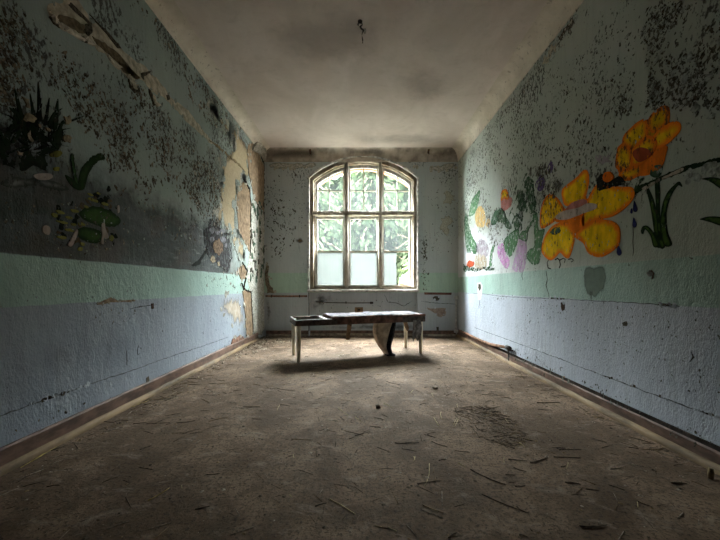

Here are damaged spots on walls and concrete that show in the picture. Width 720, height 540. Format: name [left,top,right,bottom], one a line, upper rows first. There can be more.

peeling [0,0,306,346]
peeling [467,0,720,200]
crack [1,337,228,416]